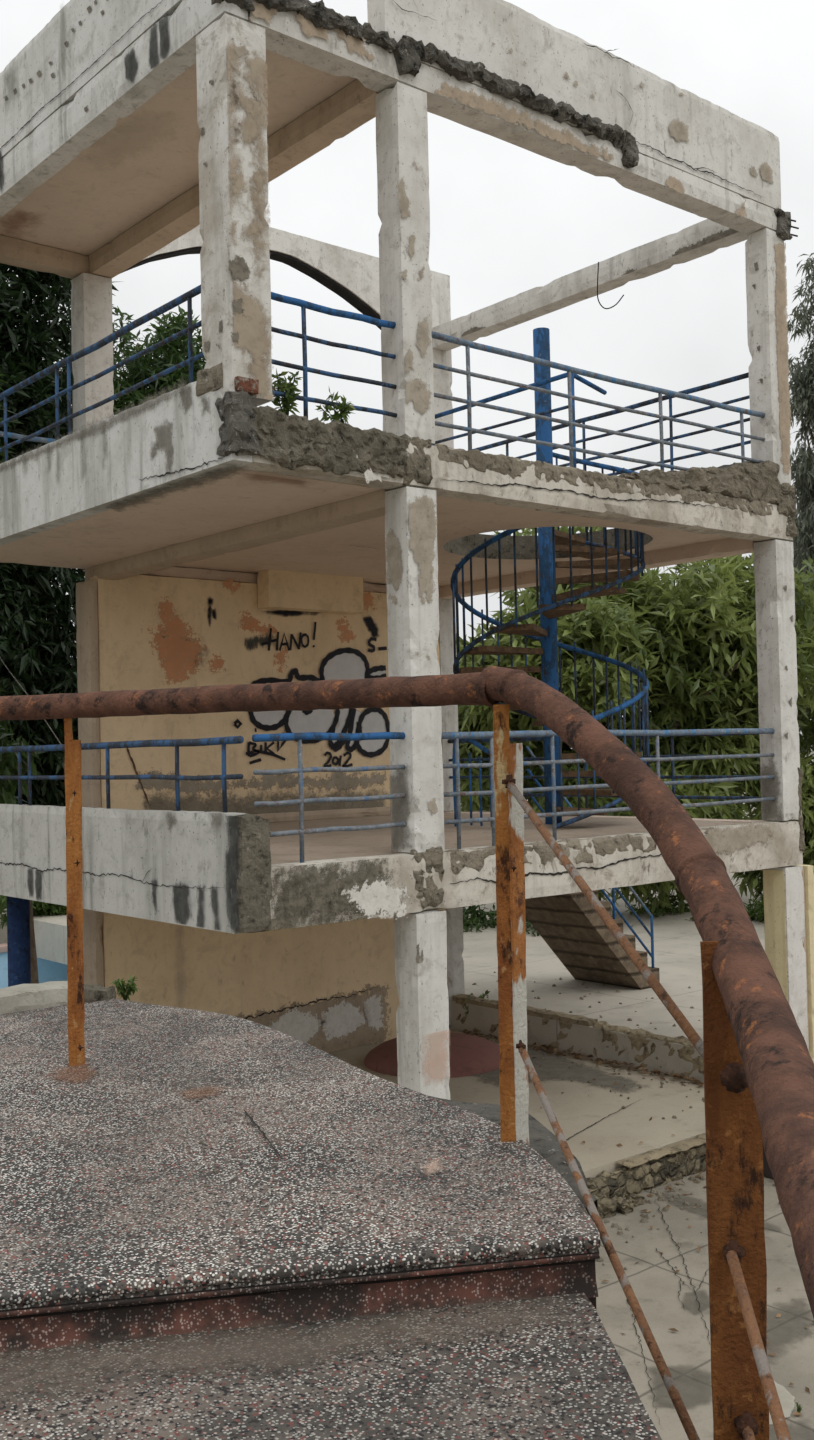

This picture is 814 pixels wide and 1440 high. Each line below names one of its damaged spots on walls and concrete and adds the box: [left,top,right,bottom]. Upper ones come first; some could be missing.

leakage [124,14,169,83]
spalling [211,0,639,168]
spalling [196,170,799,610]
crack [445,479,730,509]
peeling [147,596,226,684]
leakage [27,868,41,900]
crack [0,862,224,890]
leakage [152,880,219,930]
peeling [326,846,496,922]
spalling [524,834,657,865]
peeling [700,822,774,855]
peeling [231,984,391,1053]